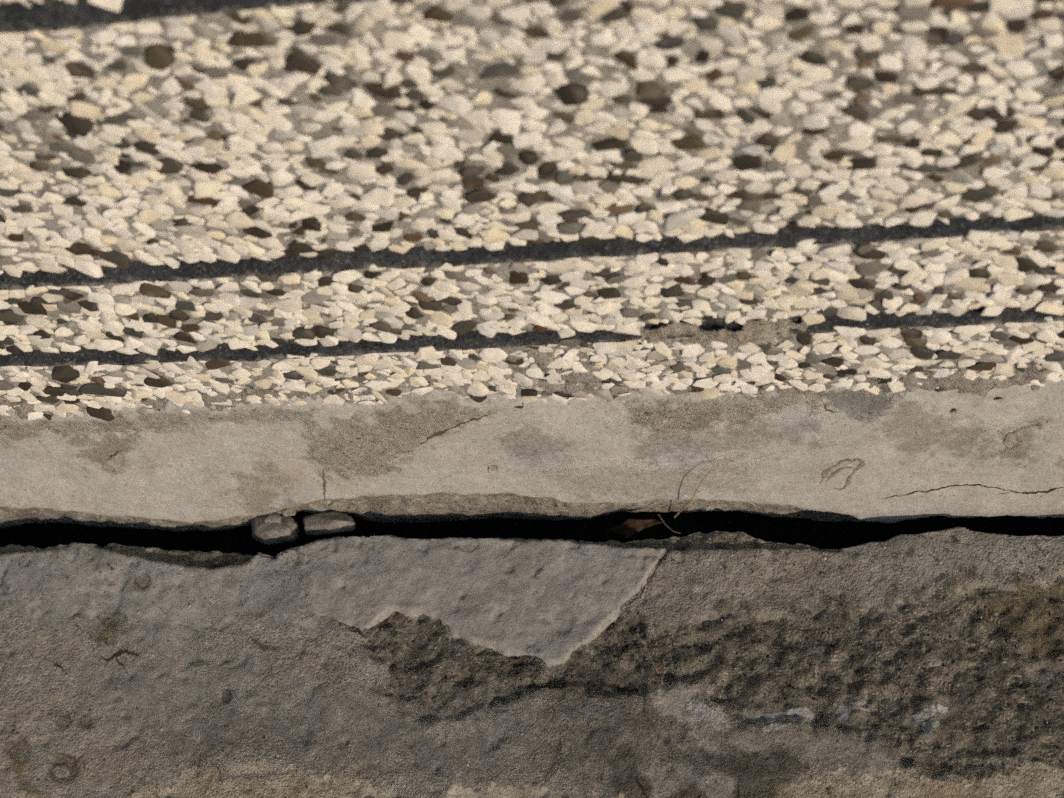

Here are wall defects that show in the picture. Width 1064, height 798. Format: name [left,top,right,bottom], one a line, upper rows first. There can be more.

crack [0,471,1064,557]
spalling [282,532,1064,798]
peeling [129,757,377,798]